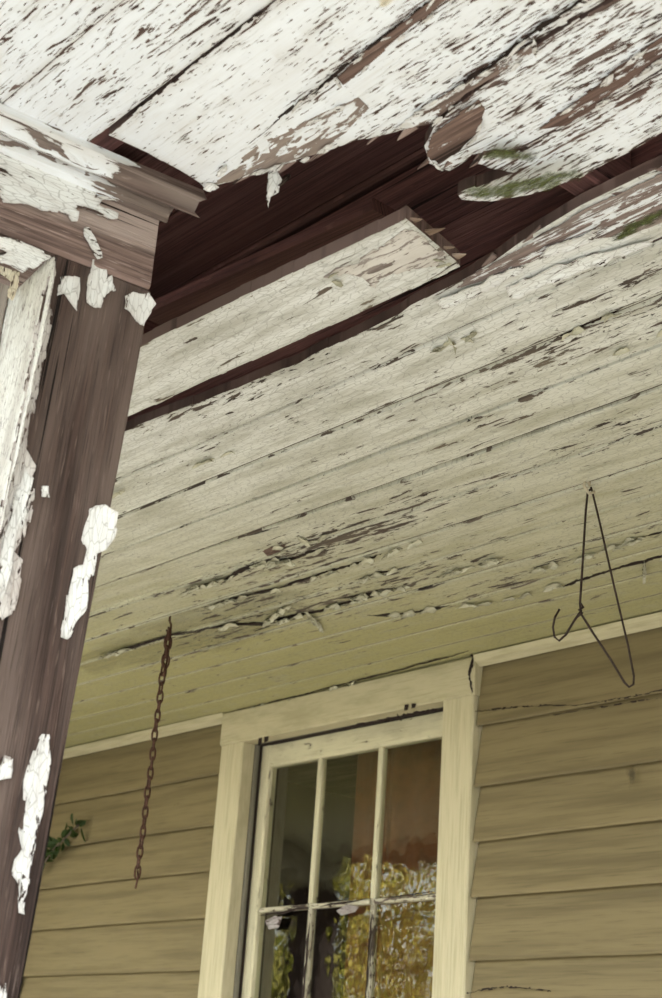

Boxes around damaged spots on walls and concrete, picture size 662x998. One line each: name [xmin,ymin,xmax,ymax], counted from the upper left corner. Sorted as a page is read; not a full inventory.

peeling [203,97,369,207]
peeling [333,0,445,88]
peeling [395,38,537,171]
peeling [539,37,662,129]
peeling [323,229,452,289]
peeling [436,173,662,309]
peeling [0,154,156,639]
peeling [262,545,286,559]
crack [97,531,662,661]
peeling [0,755,14,780]
peeling [11,734,51,914]
crack [466,985,551,994]